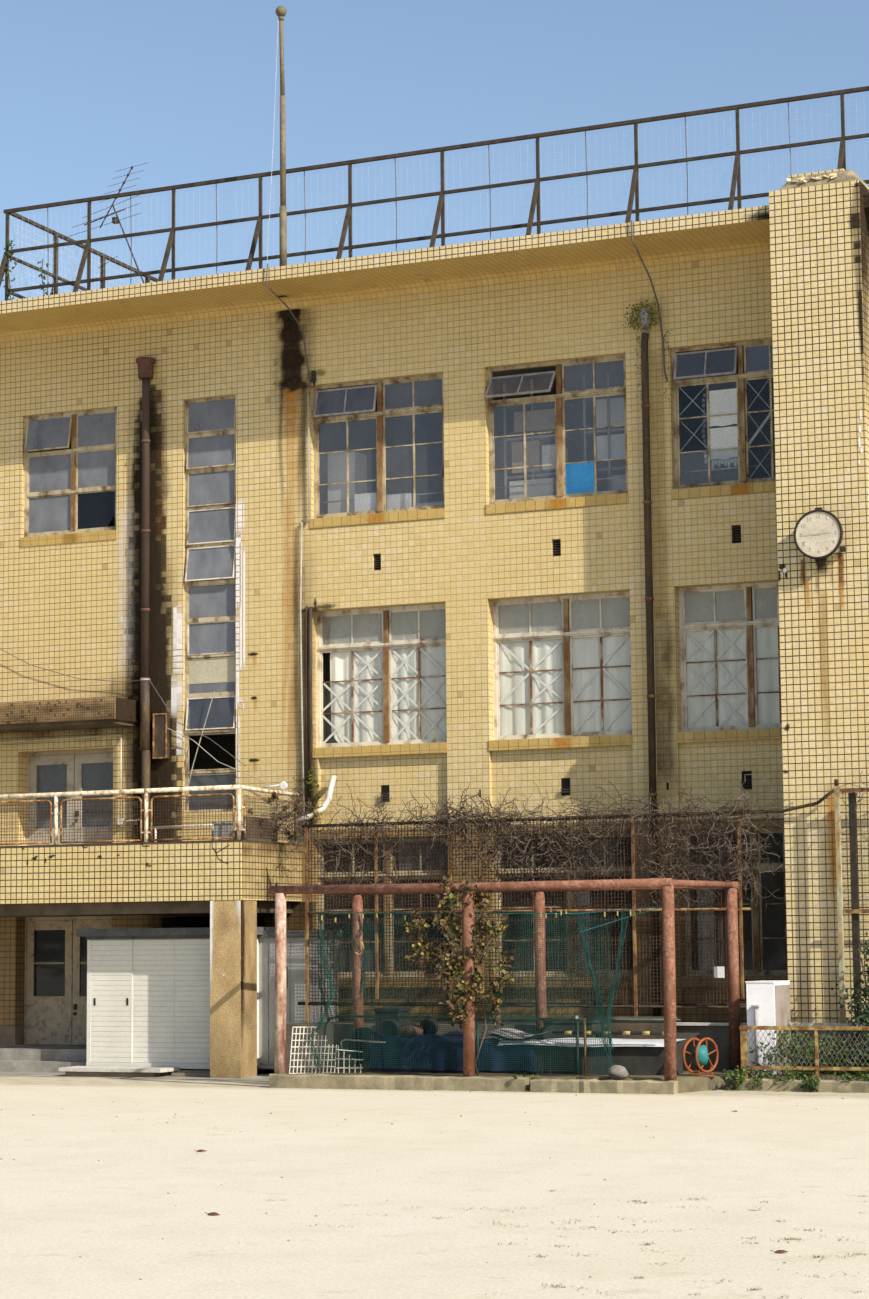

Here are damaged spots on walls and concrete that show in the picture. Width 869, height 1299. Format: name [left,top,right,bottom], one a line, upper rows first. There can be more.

damp [278,296,308,464]
damp [850,180,869,380]
damp [88,384,182,842]
corrosion [801,554,844,584]